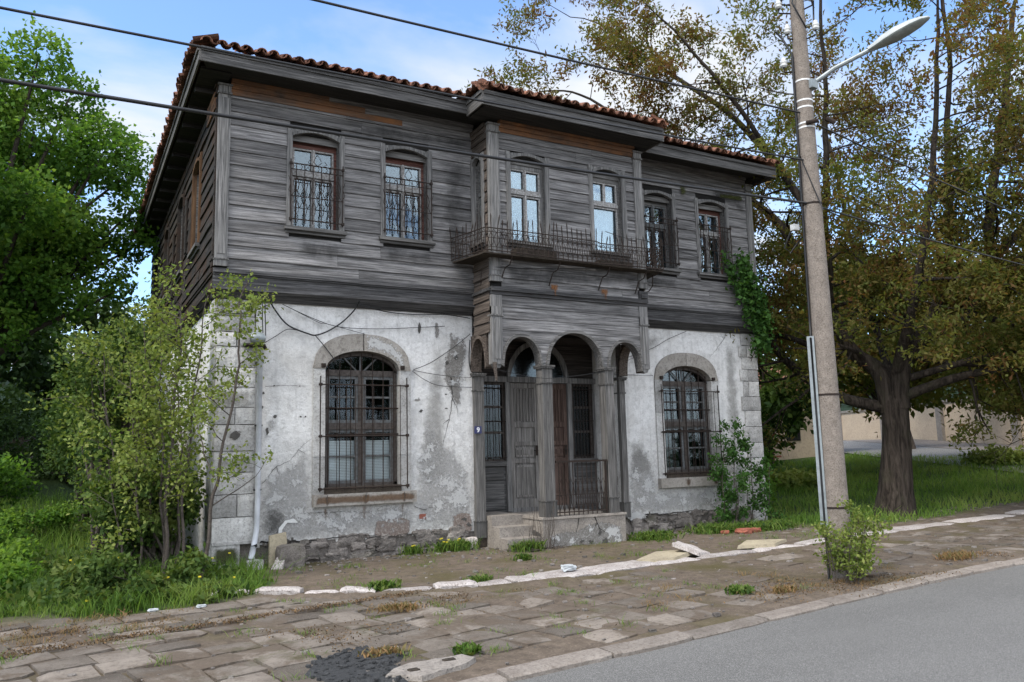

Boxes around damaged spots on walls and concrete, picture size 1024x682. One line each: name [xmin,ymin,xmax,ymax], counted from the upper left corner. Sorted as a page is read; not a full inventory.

peeling [435,323,466,404]
peeling [263,431,472,536]
peeling [630,451,744,521]